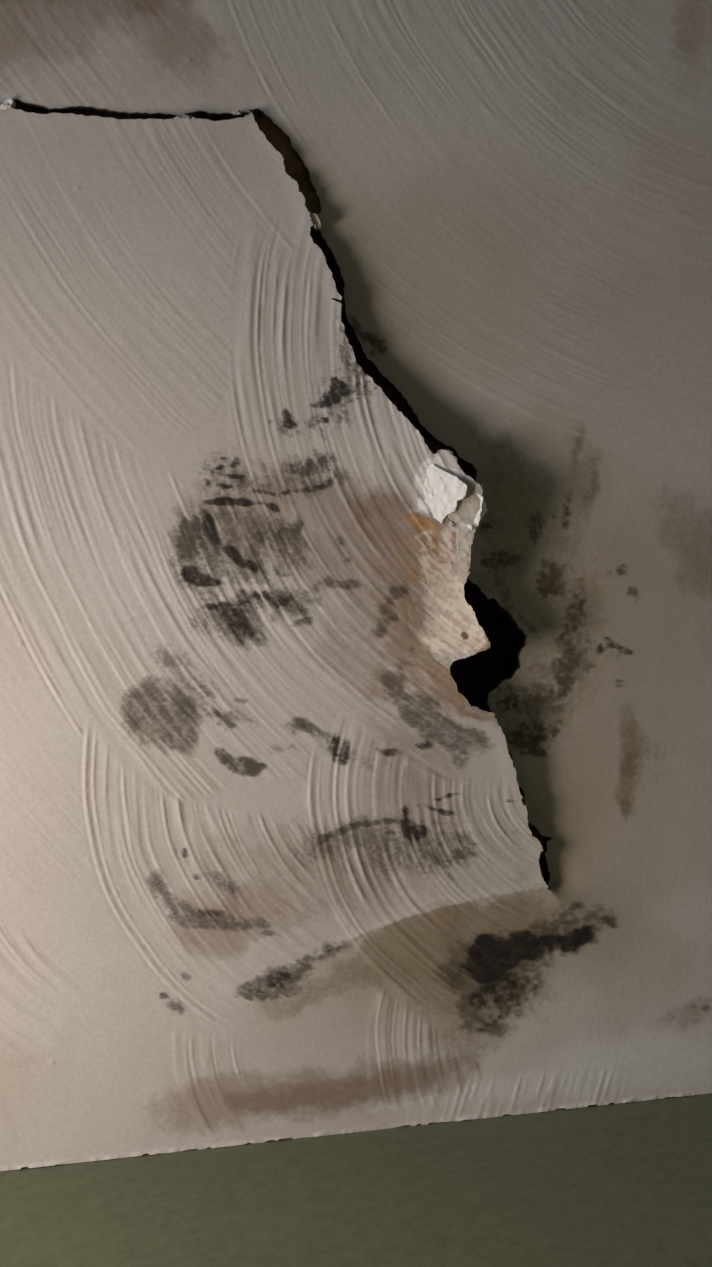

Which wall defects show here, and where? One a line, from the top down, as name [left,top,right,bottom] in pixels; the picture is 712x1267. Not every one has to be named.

spalling [311,213,321,230]
crack [14,100,480,485]
damp [170,456,416,645]
peeling [413,449,527,713]
mould [125,678,234,751]
mould [382,668,486,760]
mould [214,750,265,776]
damp [310,806,474,876]
crack [483,707,552,885]
mould [240,945,345,1001]
damp [351,900,615,1035]
damp [180,1062,462,1124]